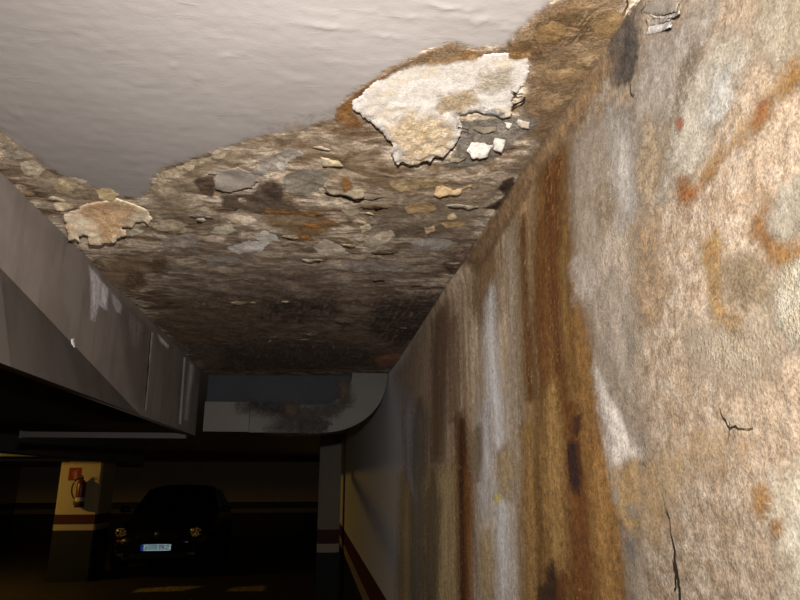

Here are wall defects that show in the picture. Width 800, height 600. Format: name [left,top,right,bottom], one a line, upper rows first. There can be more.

peeling [623,0,680,35]
peeling [0,0,565,376]
damp [154,283,461,600]
corrosion [455,412,478,600]
corrosion [471,143,629,600]
damp [464,0,752,600]
crack [638,438,681,600]
crack [719,408,753,444]
corrosion [680,58,800,201]
corrosion [752,213,800,268]